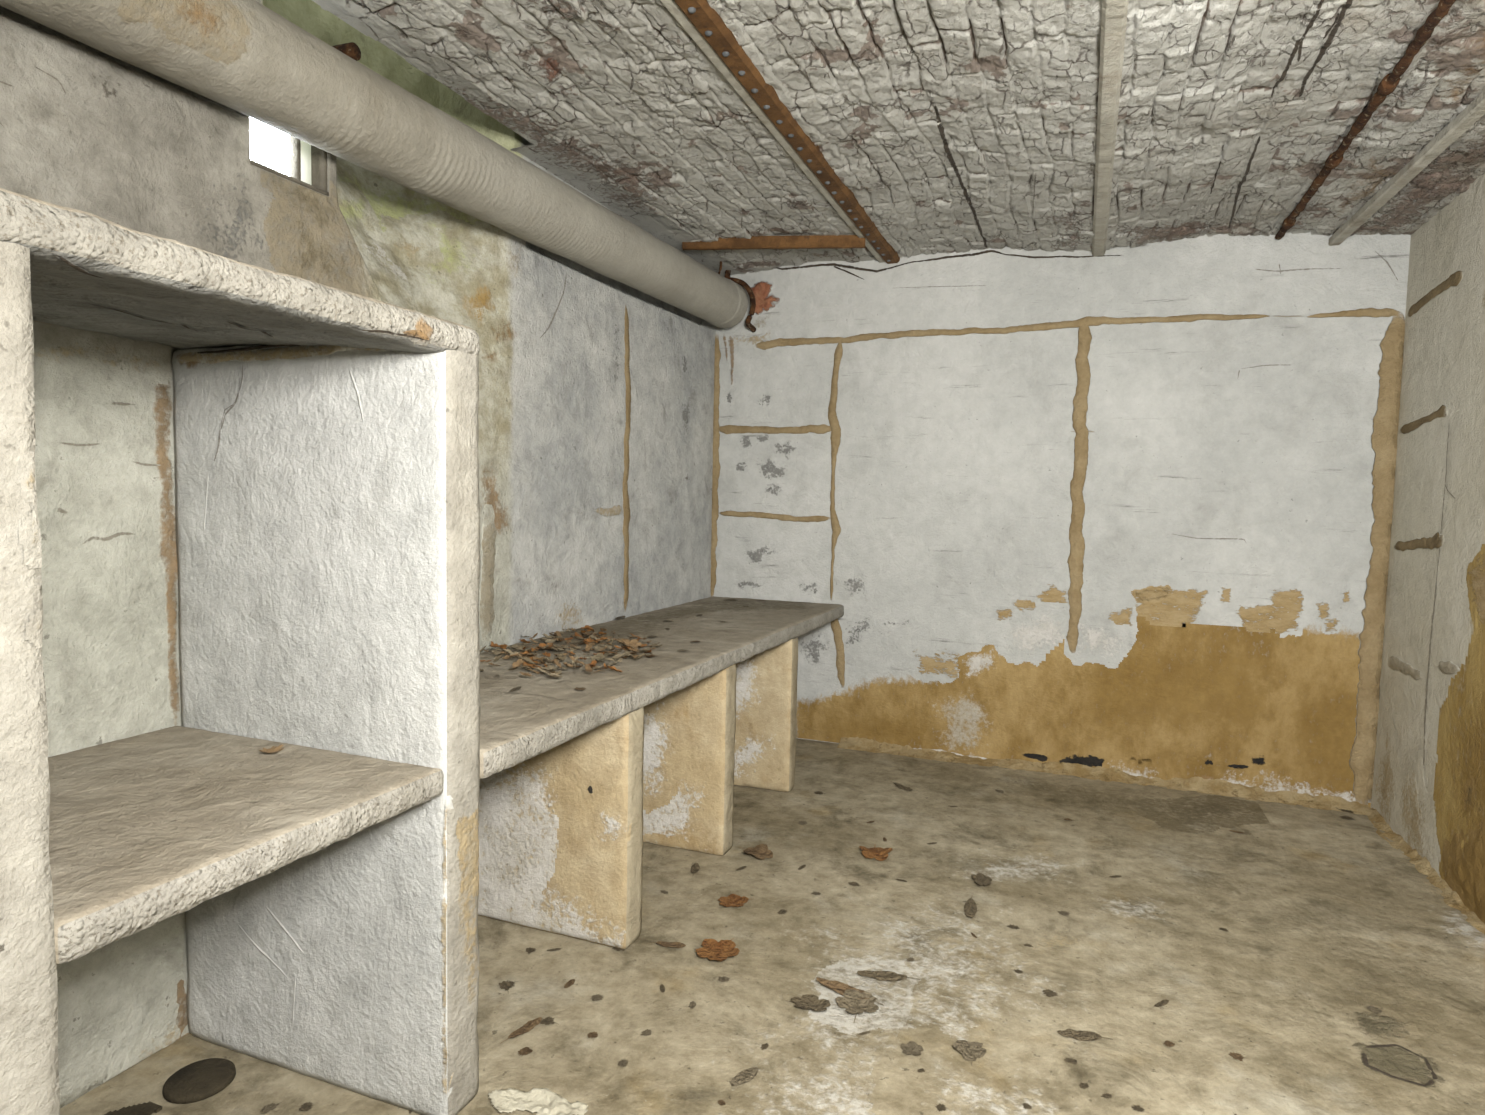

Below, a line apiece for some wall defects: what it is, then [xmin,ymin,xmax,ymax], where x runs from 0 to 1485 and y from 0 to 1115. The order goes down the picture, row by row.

crack [1270,0,1354,98]
crack [0,64,68,98]
crack [774,103,1124,288]
crack [1210,135,1261,230]
rust [682,235,865,250]
crack [1254,263,1344,275]
crack [1374,250,1399,282]
peeling [994,581,1069,622]
peeling [1104,585,1352,638]
peeling [1247,753,1270,768]
spalling [1442,775,1485,924]